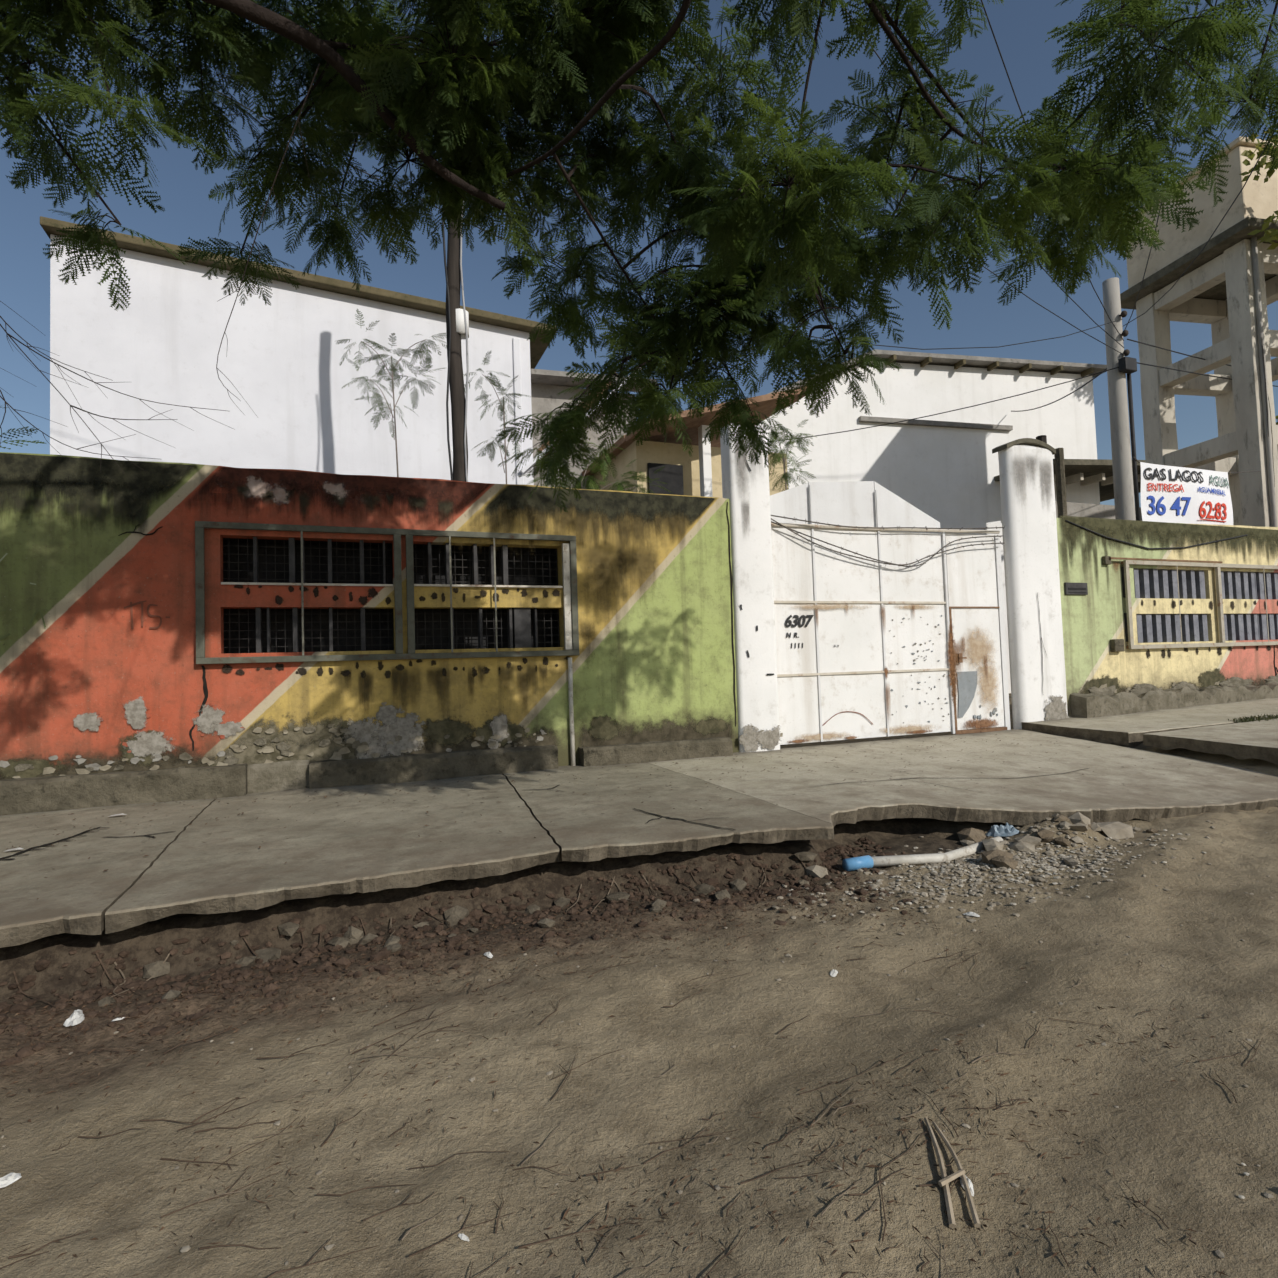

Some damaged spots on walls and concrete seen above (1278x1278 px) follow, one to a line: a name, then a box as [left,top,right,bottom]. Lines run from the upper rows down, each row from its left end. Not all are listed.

damp [0,453,196,529]
damp [1062,516,1278,575]
crack [189,665,208,751]
flaking render [0,696,427,778]
damp [221,656,569,704]
damp [358,717,557,759]
corrosion [948,625,997,703]
corrosion [965,719,998,730]
crack [0,827,174,860]